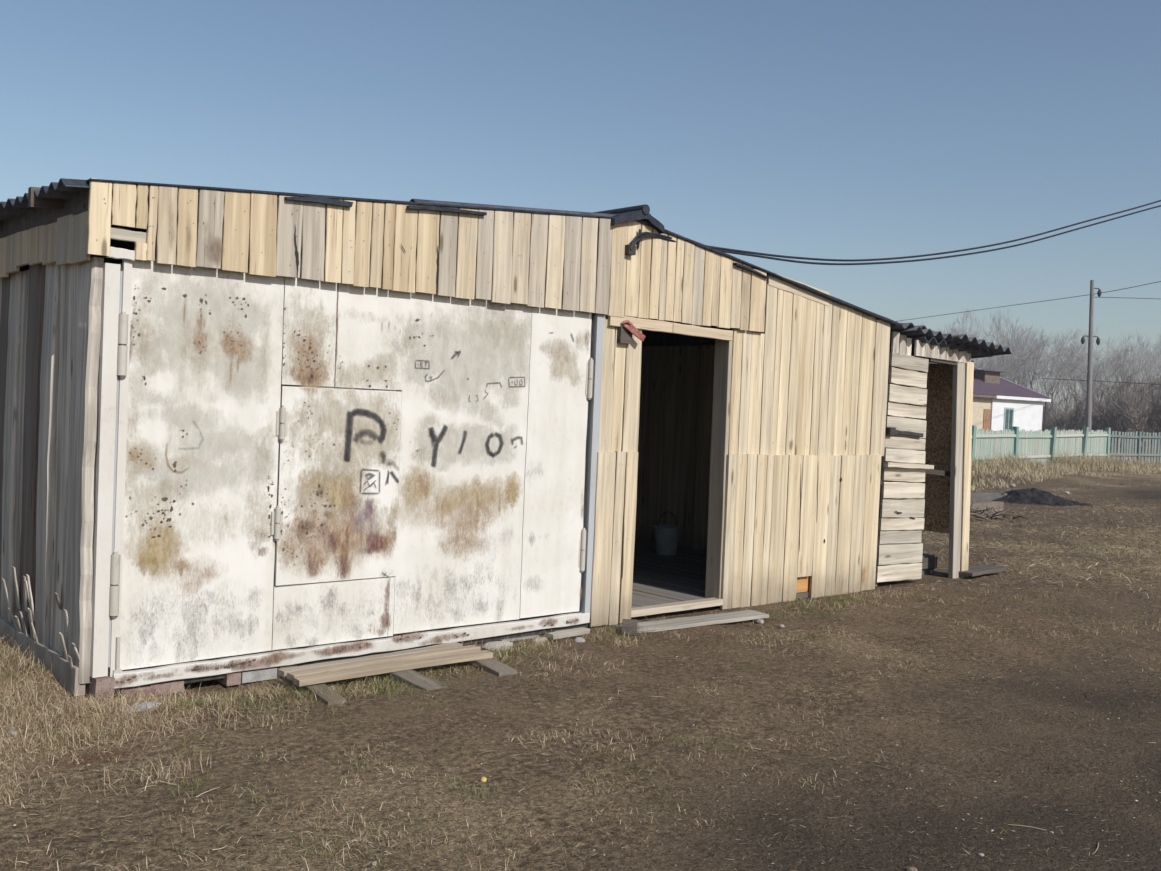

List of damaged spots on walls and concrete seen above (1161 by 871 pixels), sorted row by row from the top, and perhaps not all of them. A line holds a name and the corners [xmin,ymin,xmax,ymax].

rust [291,339,327,389]
rust [139,526,186,573]
rust [288,493,393,577]
rust [404,469,519,545]
rust [315,588,470,655]
rust [191,652,295,672]